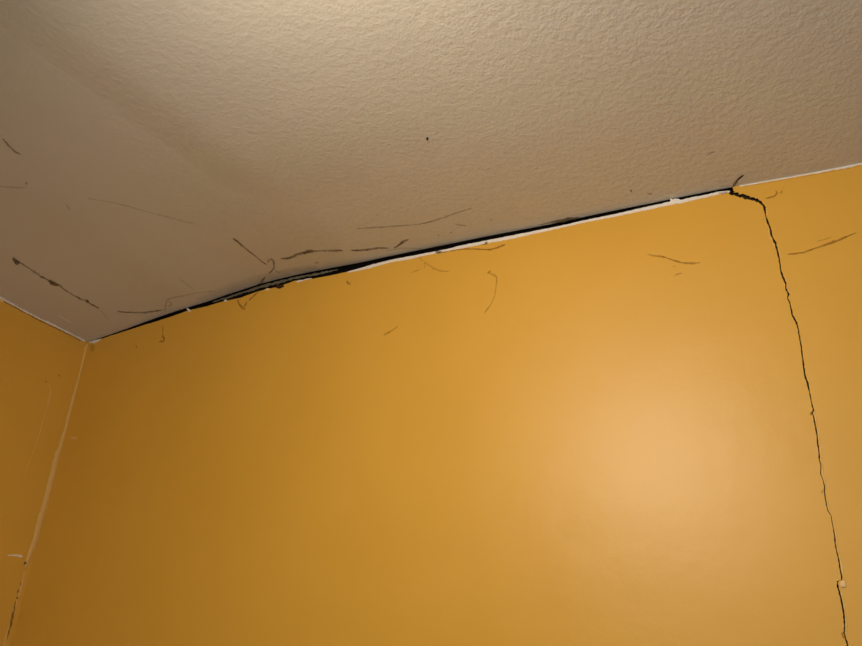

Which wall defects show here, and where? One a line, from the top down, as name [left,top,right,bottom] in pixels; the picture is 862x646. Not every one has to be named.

crack [13,258,98,308]
crack [234,239,408,308]
crack [730,175,851,646]